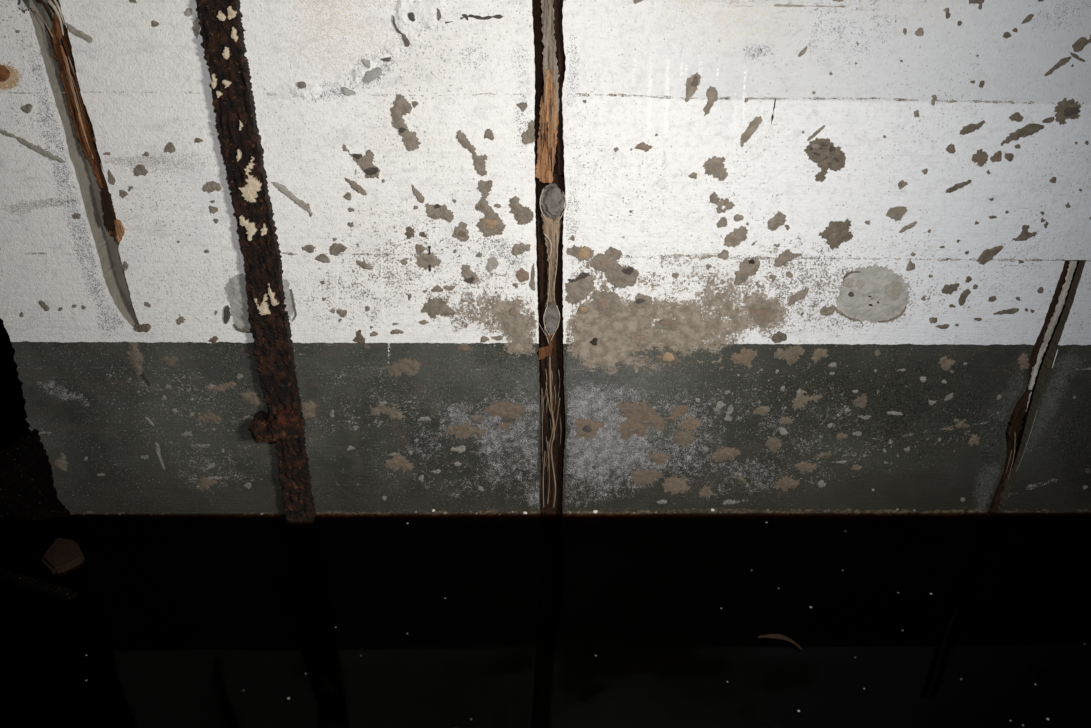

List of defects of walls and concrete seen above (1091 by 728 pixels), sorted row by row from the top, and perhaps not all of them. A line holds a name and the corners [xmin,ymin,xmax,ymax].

corrosion [0,63,23,92]
spalling [107,151,149,198]
spalling [613,133,658,152]
spalling [762,131,877,189]
spalling [38,300,86,311]
peeling [565,156,1049,504]
efflorescence [381,351,539,509]
damp [565,346,1024,522]